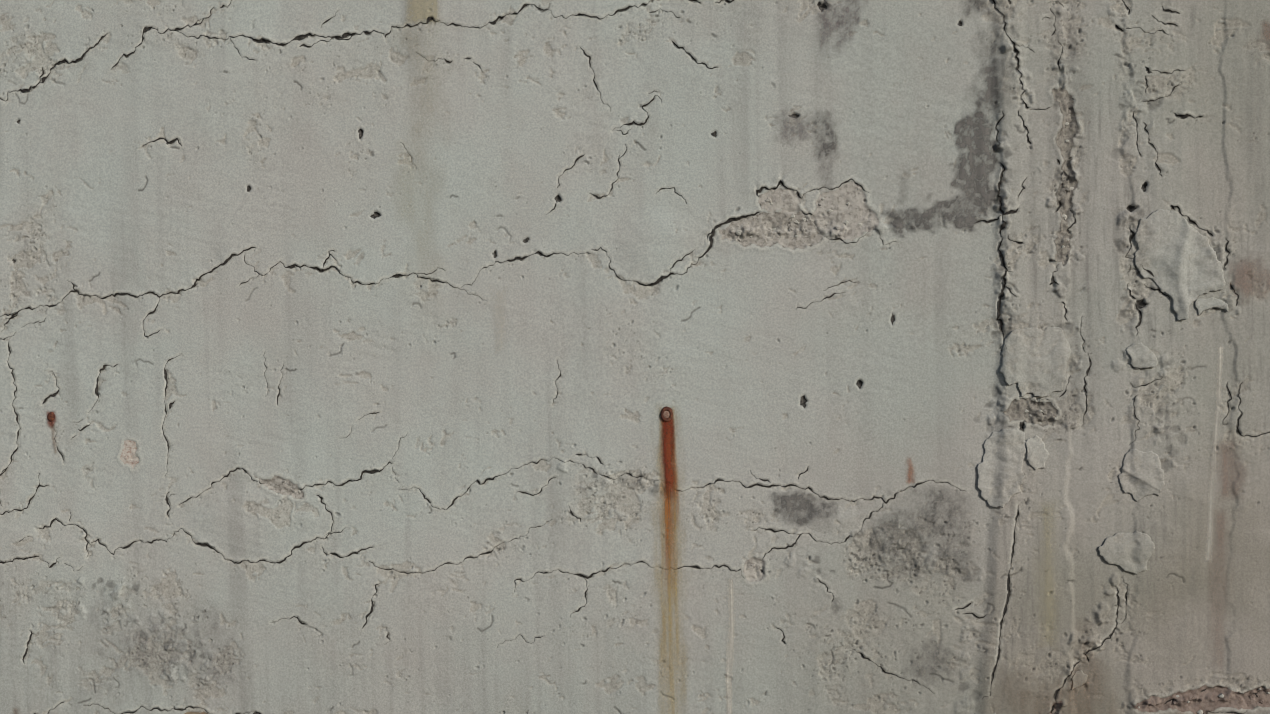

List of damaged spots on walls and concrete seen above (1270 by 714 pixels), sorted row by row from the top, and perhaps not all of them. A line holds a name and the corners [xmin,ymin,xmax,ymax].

crack [145,138,182,146]
crack [0,0,734,101]
crack [581,48,660,199]
spalling [719,209,823,250]
water stain [887,46,999,233]
crack [974,0,1073,346]
crack [0,179,965,645]
crack [1020,259,1092,420]
corrosion [661,419,678,655]
crack [955,505,1019,699]
crack [1051,583,1128,714]
spalling [1132,685,1270,714]